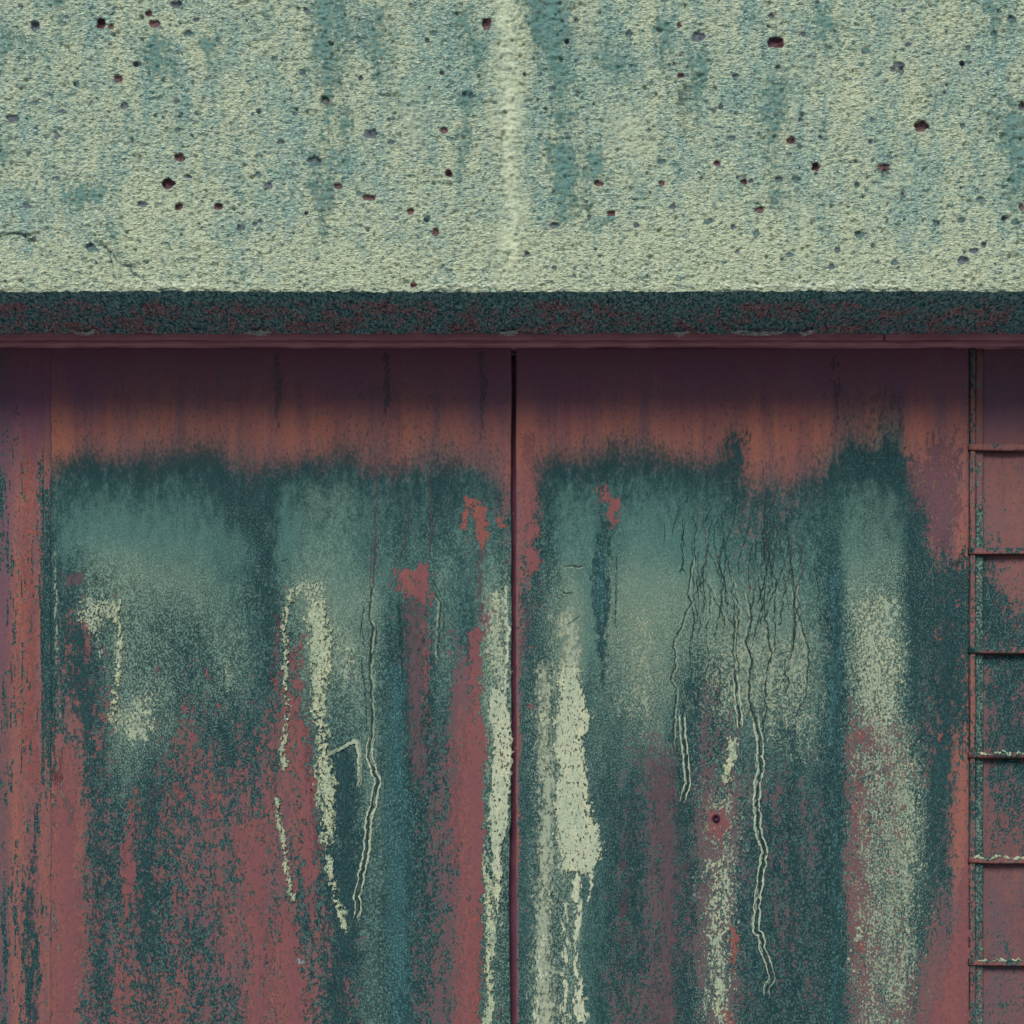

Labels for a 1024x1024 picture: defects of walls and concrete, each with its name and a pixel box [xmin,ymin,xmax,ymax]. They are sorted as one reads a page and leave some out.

damp [496,0,614,268]
rust [12,429,43,784]